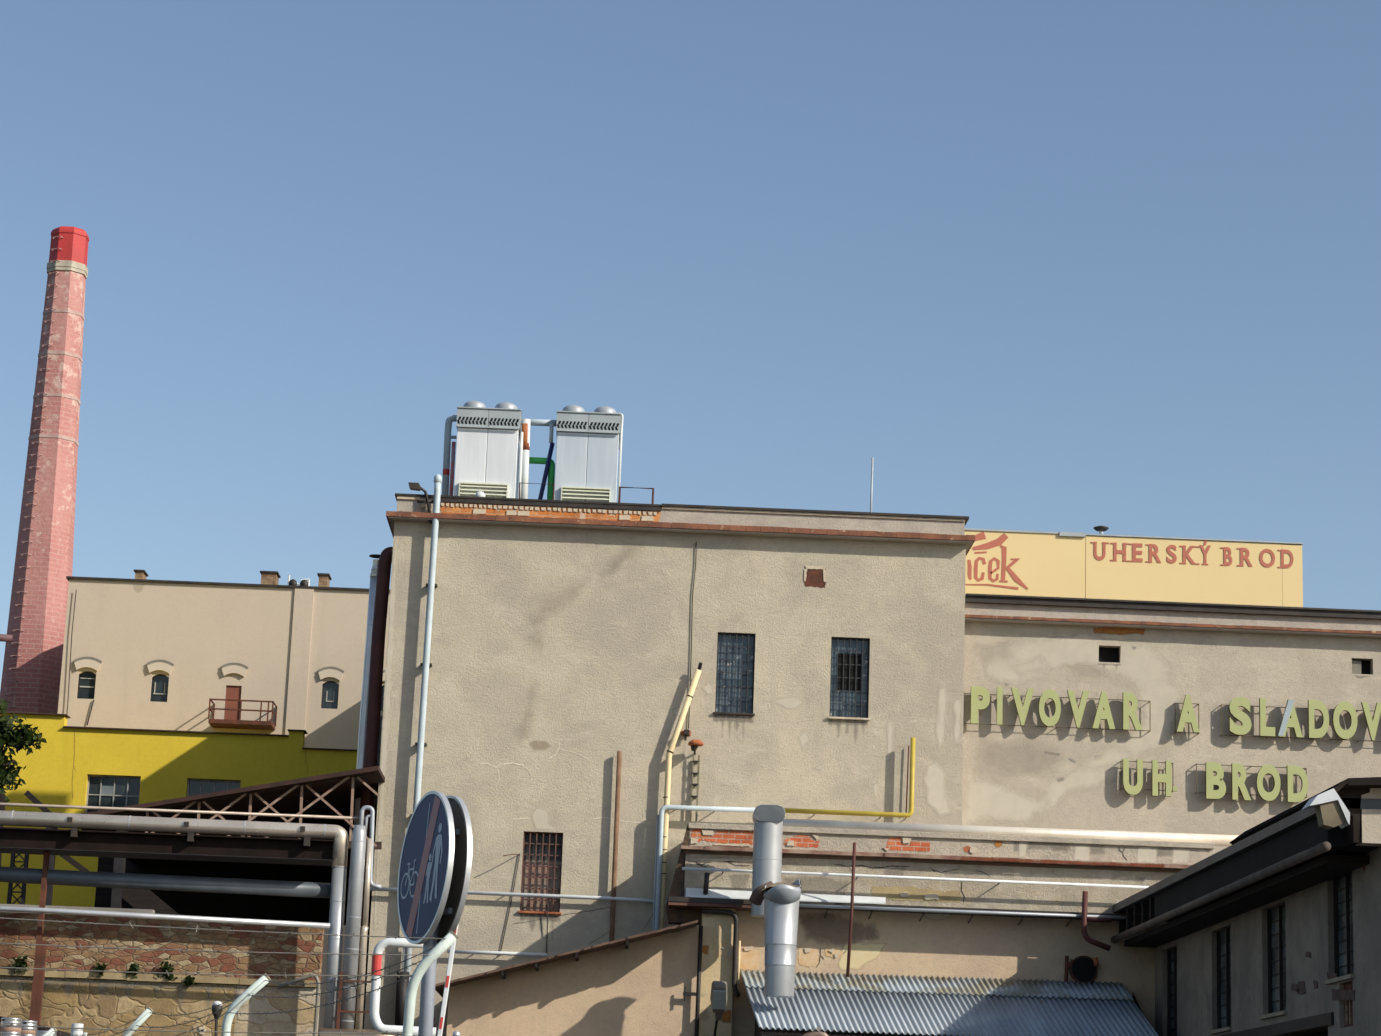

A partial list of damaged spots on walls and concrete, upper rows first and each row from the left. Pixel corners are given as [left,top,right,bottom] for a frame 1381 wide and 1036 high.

flaking render [419,502,661,523]
efflorescence [936,687,961,747]
efflorescence [924,764,949,815]
flaking render [691,829,754,847]
flaking render [784,835,820,848]
flaking render [884,837,930,851]